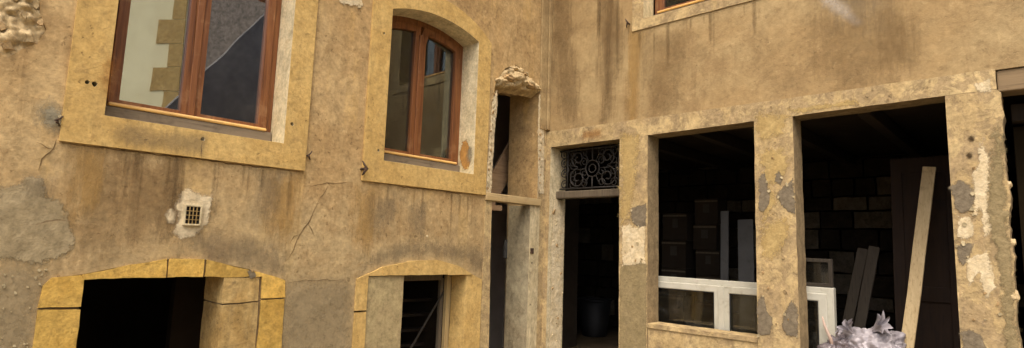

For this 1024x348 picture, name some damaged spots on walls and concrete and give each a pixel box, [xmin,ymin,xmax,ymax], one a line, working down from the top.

spalling [0,0,45,57]
peeling [974,79,991,93]
crack [37,139,352,287]
peeling [618,133,647,348]
spalling [756,287,798,338]
peeling [755,88,874,261]
spalling [948,125,1020,348]